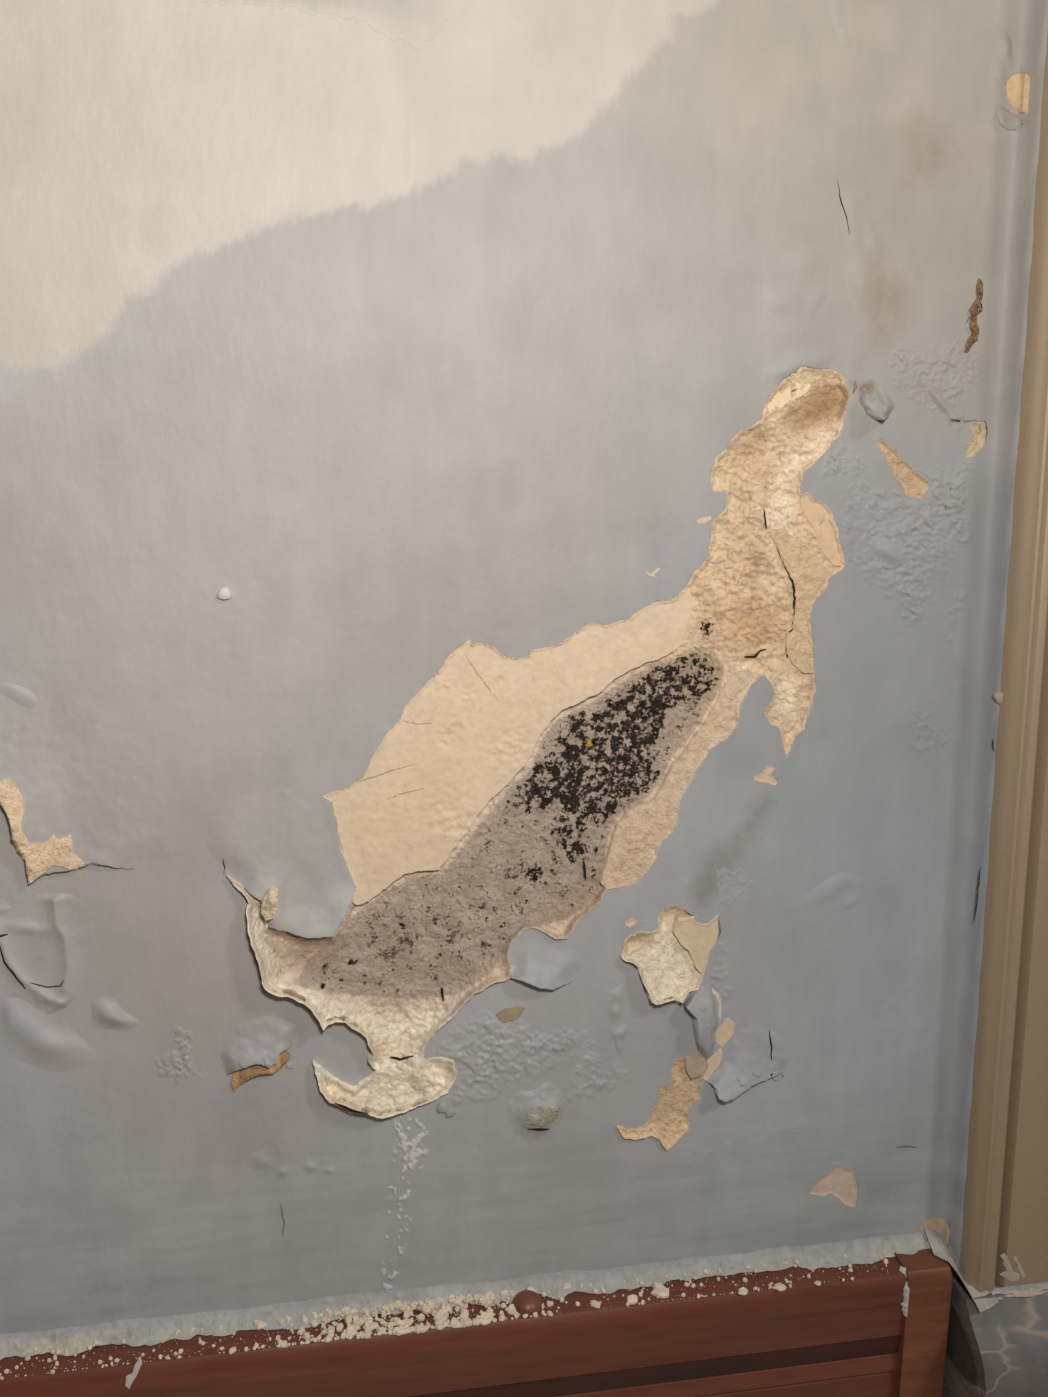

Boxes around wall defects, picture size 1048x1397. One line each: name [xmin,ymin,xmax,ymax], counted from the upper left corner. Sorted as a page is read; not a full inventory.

leakage [200,0,449,50]
peeling [995,73,1030,131]
spalling [964,278,983,353]
peeling [877,440,930,500]
peeling [0,670,179,885]
leakage [295,647,725,1000]
spalling [206,366,895,1152]
leakage [681,788,780,919]
leakage [380,1116,430,1293]
peeling [808,1164,857,1208]